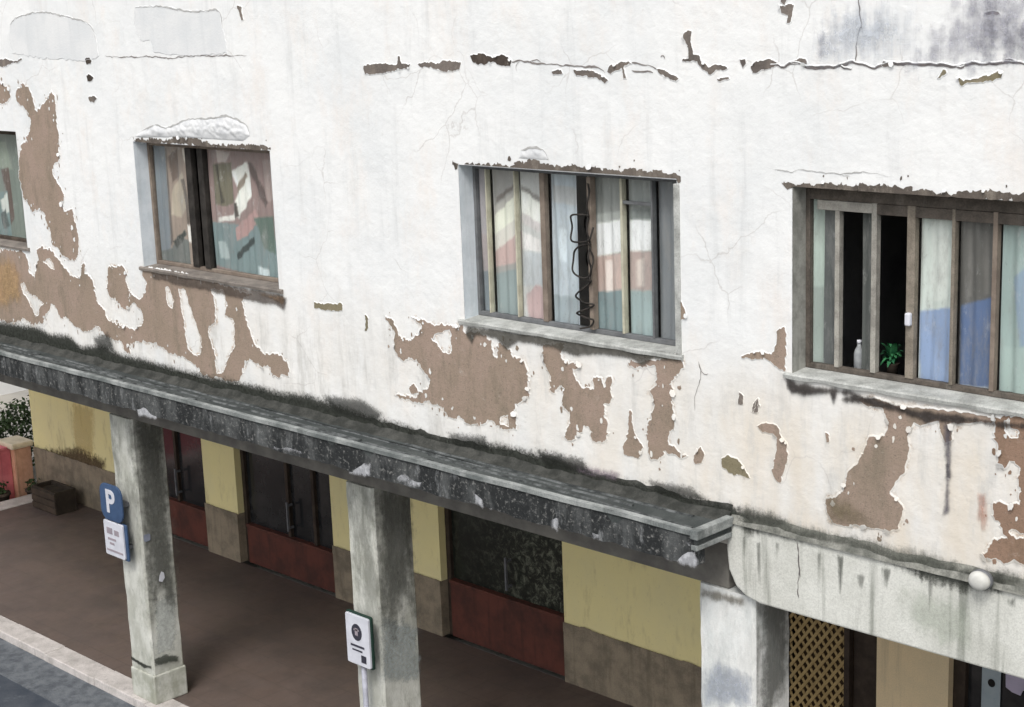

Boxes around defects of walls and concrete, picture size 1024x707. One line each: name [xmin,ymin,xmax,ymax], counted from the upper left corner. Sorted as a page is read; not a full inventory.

crack [770,0,1024,70]
peeling [363,52,513,76]
flaking render [551,60,632,84]
flaking render [656,68,680,83]
peeling [0,58,291,383]
peeling [741,326,788,372]
peeling [385,312,705,471]
damp [353,464,369,475]
peeling [823,395,1024,567]